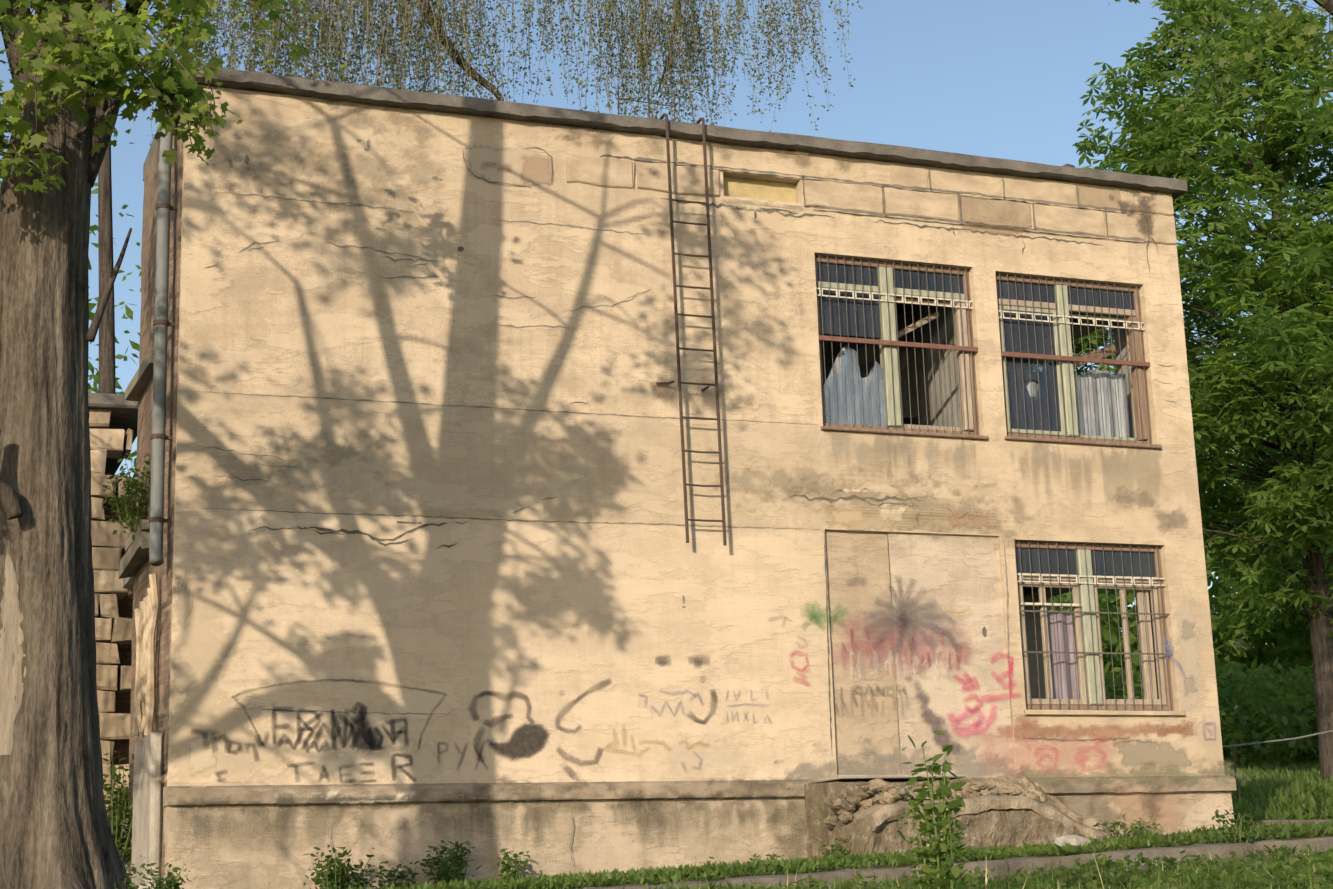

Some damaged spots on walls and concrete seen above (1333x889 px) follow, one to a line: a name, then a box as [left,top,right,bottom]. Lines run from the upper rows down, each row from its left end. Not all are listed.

spalling [462,146,553,187]
crack [216,192,412,212]
crack [871,220,1099,256]
crack [328,242,439,279]
crack [492,290,649,328]
crack [185,445,922,749]
spalling [1000,723,1193,743]